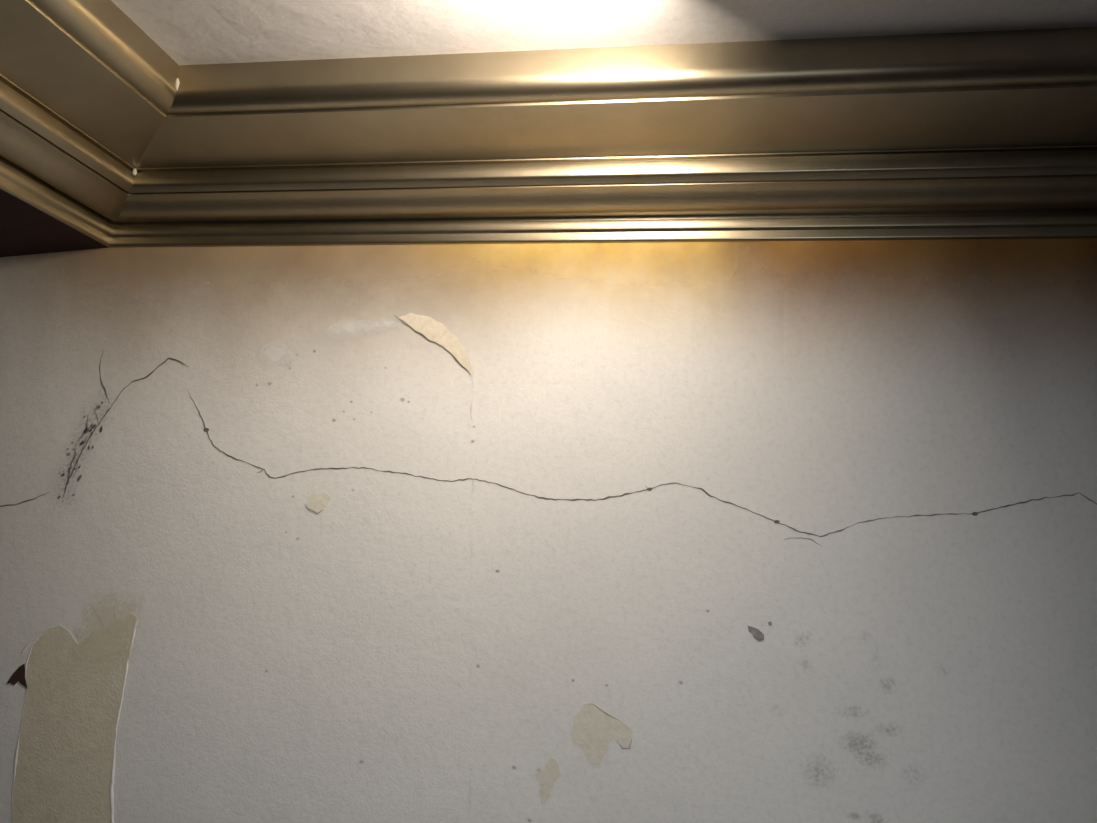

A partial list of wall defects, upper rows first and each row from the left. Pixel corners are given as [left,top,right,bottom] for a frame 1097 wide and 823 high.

spalling [394,313,472,376]
crack [0,353,188,507]
crack [190,397,1096,543]
peeling [11,611,138,823]
spalling [571,704,633,766]